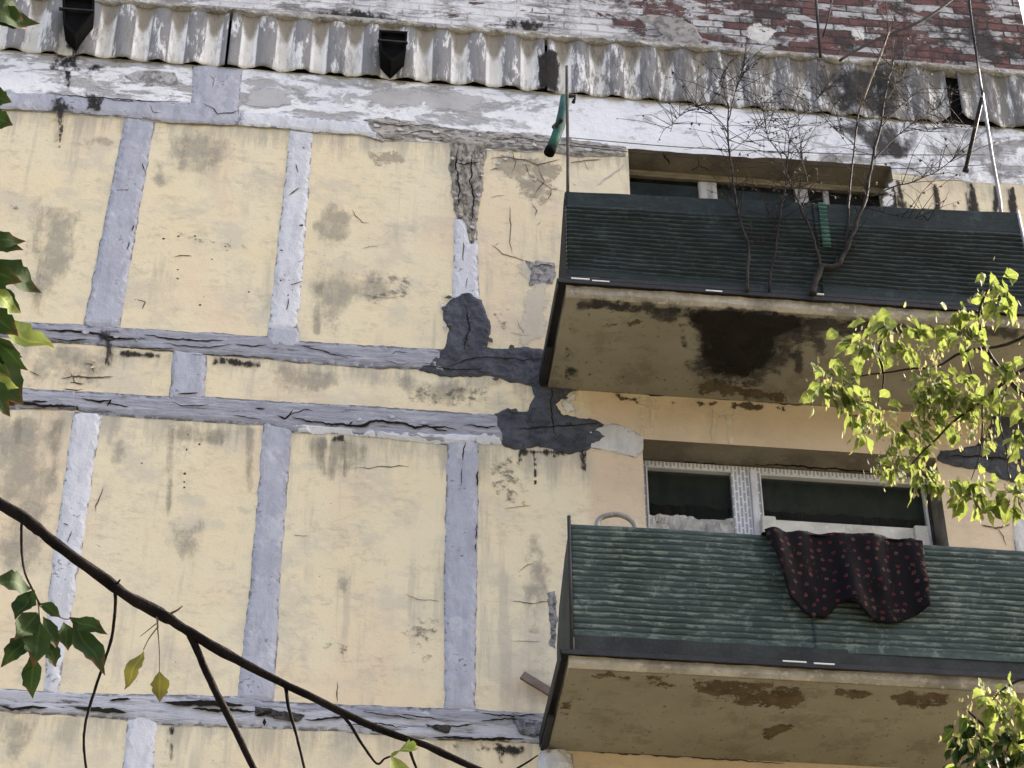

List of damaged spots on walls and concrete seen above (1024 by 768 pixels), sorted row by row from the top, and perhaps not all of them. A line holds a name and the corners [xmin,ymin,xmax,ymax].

peeling [745,23,777,45]
spalling [125,70,179,87]
peeling [244,85,307,108]
spalling [330,87,627,244]
crack [489,152,623,261]
crack [12,329,265,410]
crack [524,389,601,436]
leakage [646,305,917,444]